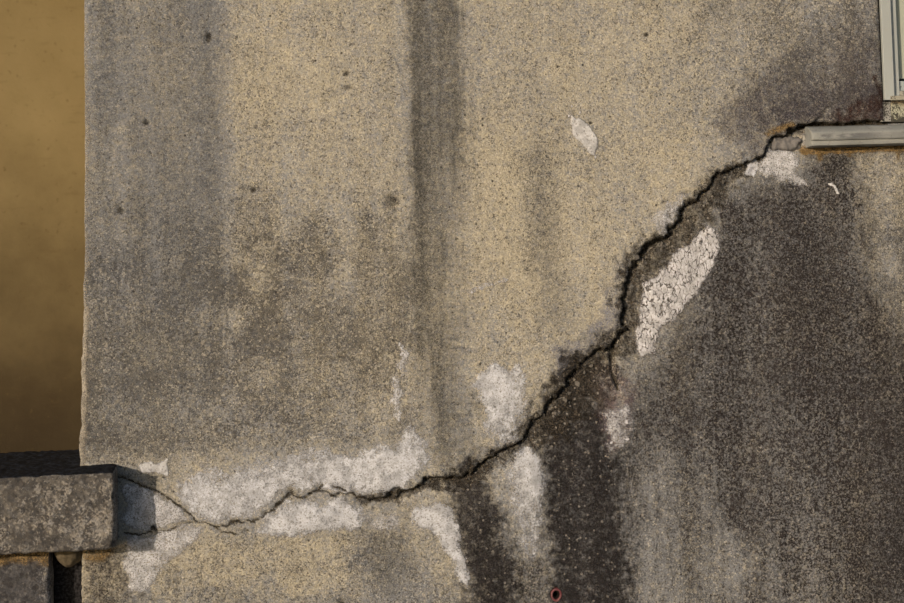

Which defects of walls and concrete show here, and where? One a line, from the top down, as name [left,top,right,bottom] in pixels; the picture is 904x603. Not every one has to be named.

corrosion [835,75,883,122]
damp [390,342,409,421]
crack [119,119,888,536]
damp [412,154,904,603]
damp [87,426,430,603]